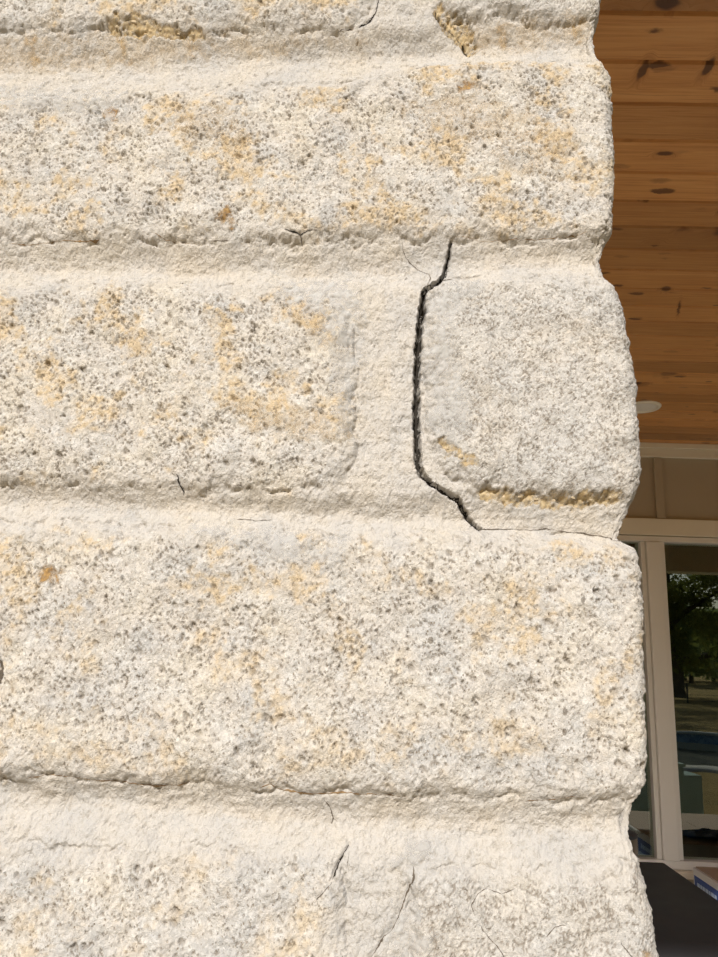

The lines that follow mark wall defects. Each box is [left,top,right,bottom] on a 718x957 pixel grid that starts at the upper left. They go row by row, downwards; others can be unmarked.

spalling [433,4,477,57]
crack [402,232,620,541]
crack [27,774,188,787]
crack [260,784,406,824]
crack [315,845,349,902]
crack [371,867,415,957]